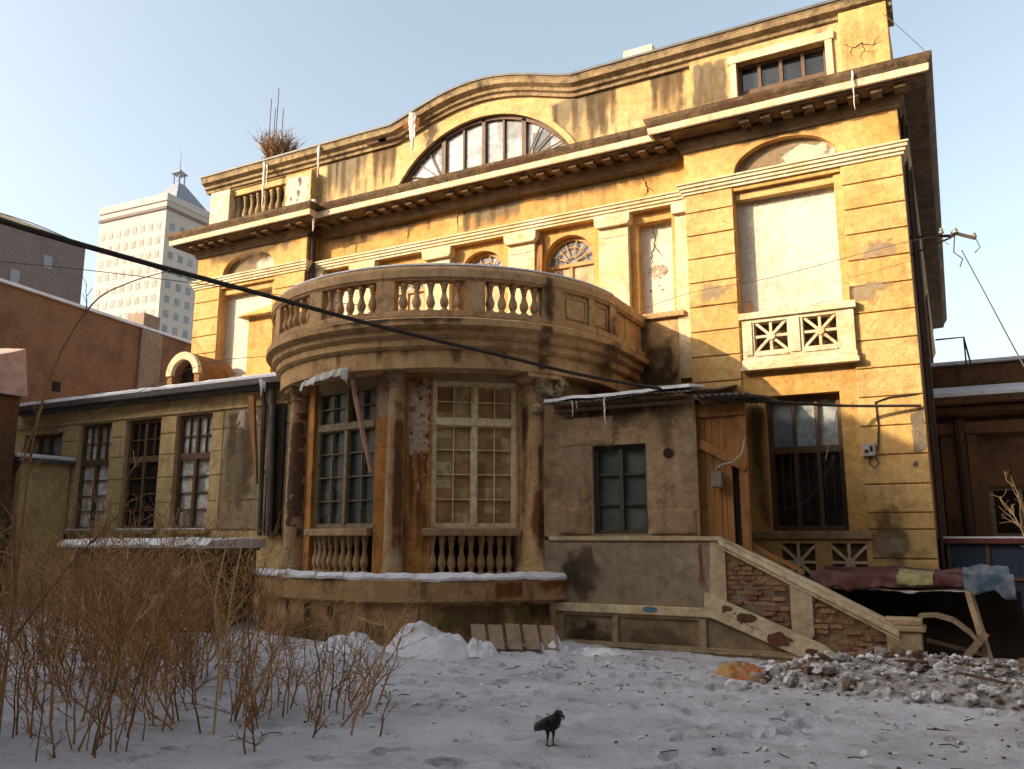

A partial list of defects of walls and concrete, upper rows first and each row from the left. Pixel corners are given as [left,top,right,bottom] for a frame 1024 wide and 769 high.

water stain [650,60,727,106]
water stain [552,87,615,138]
water stain [318,146,396,192]
peeling [782,141,836,163]
peeling [408,376,431,491]
corrosion [392,380,431,548]
water stain [878,510,907,561]
water stain [563,547,594,595]
flaking render [722,606,758,624]
flaking render [767,631,793,647]